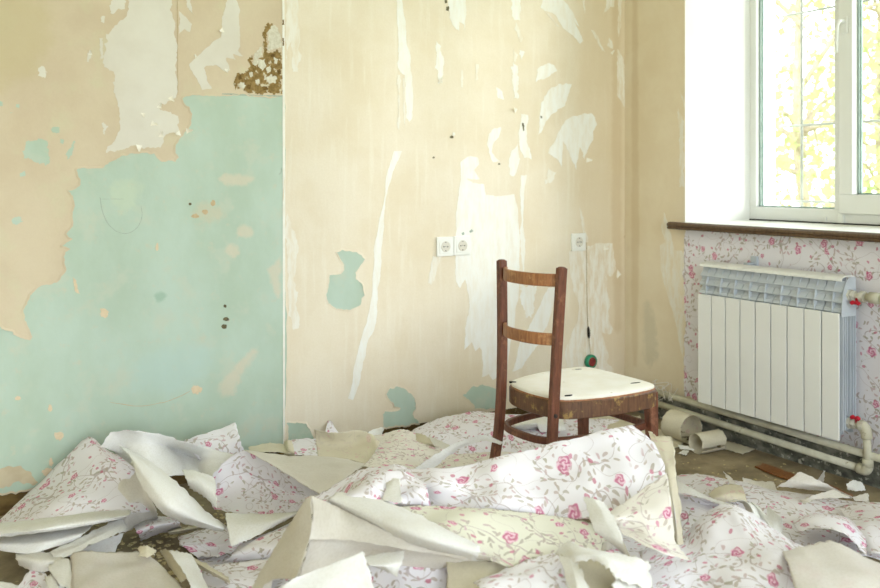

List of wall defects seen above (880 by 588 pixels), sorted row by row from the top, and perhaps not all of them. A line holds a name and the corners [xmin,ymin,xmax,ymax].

peeling [0,20,315,496]
peeling [325,248,366,312]
peeling [381,385,420,429]
peeling [462,383,496,411]